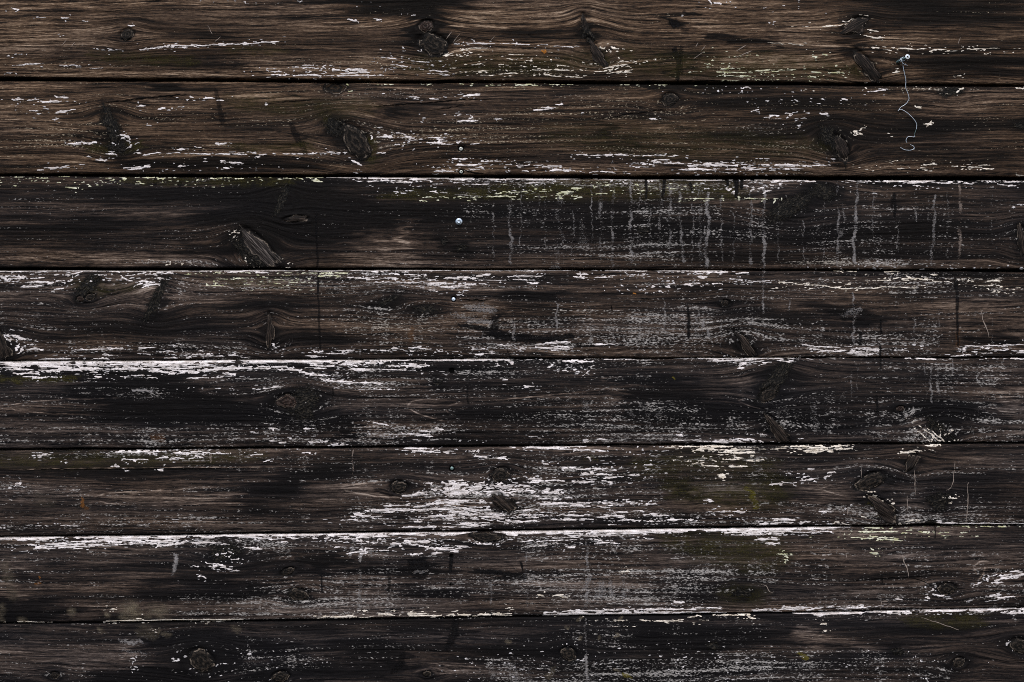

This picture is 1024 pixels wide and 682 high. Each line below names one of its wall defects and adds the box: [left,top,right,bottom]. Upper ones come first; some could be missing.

peeling [139,36,285,52]
peeling [243,39,656,101]
peeling [688,42,860,129]
peeling [860,15,998,54]
peeling [0,127,835,203]
damp [725,180,743,198]
peeling [0,257,1021,301]
peeling [0,329,635,392]
peeling [678,340,1024,369]
peeling [0,418,1024,582]
peeling [314,607,513,619]
peeling [536,570,1024,632]